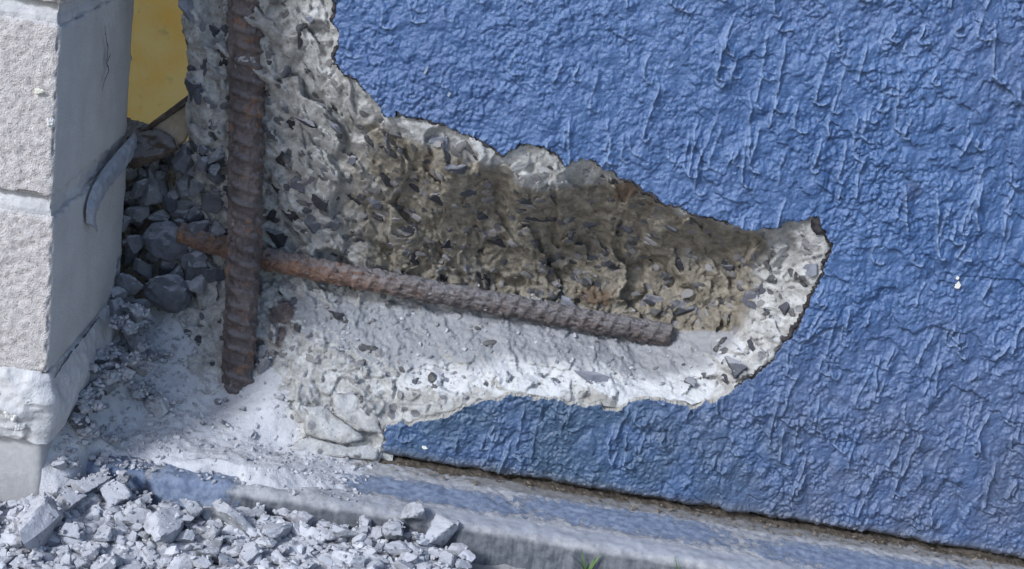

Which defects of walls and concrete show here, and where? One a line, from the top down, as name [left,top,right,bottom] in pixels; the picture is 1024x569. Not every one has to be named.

spalling [122,117,148,145]
spalling [120,202,226,396]
rust [268,298,295,347]
spalling [160,0,966,569]